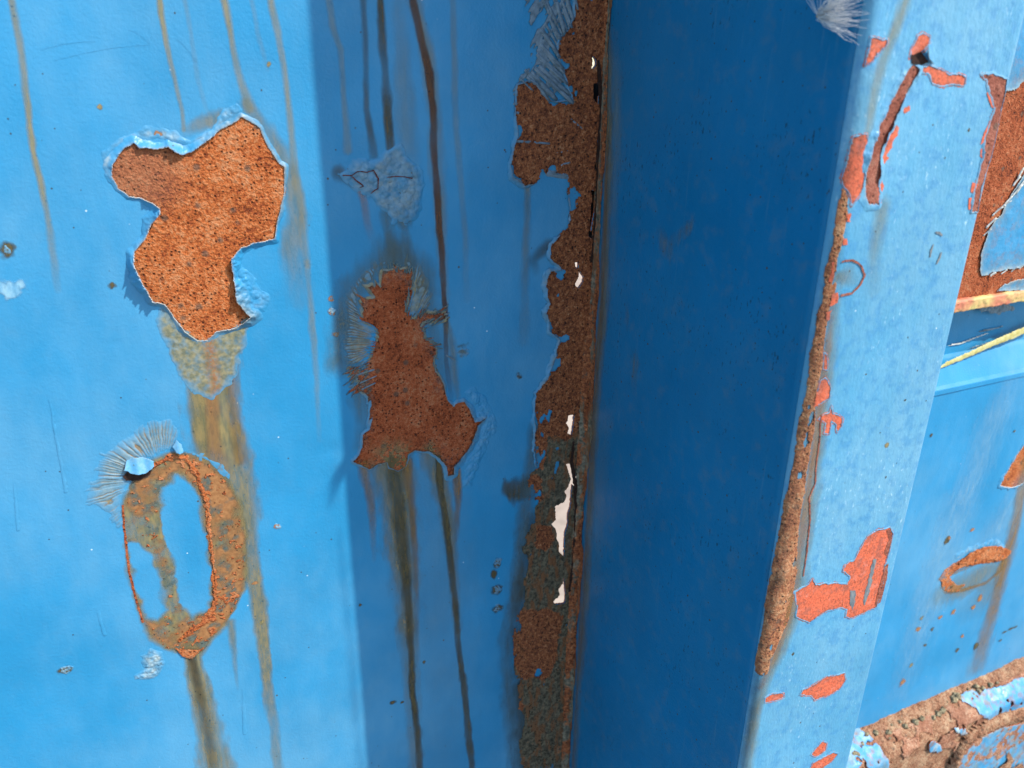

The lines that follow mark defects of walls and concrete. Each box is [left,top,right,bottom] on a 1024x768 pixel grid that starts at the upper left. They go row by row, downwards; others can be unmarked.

peeling [862,35,889,67]
peeling [908,31,967,89]
peeling [839,133,869,208]
corrosion [503,0,612,768]
corrosion [755,58,923,676]
corrosion [84,103,295,768]
corrosion [939,443,1024,624]
peeling [793,526,894,624]
peeling [799,672,847,701]
peeling [994,672,1024,687]
peeling [856,694,1024,768]